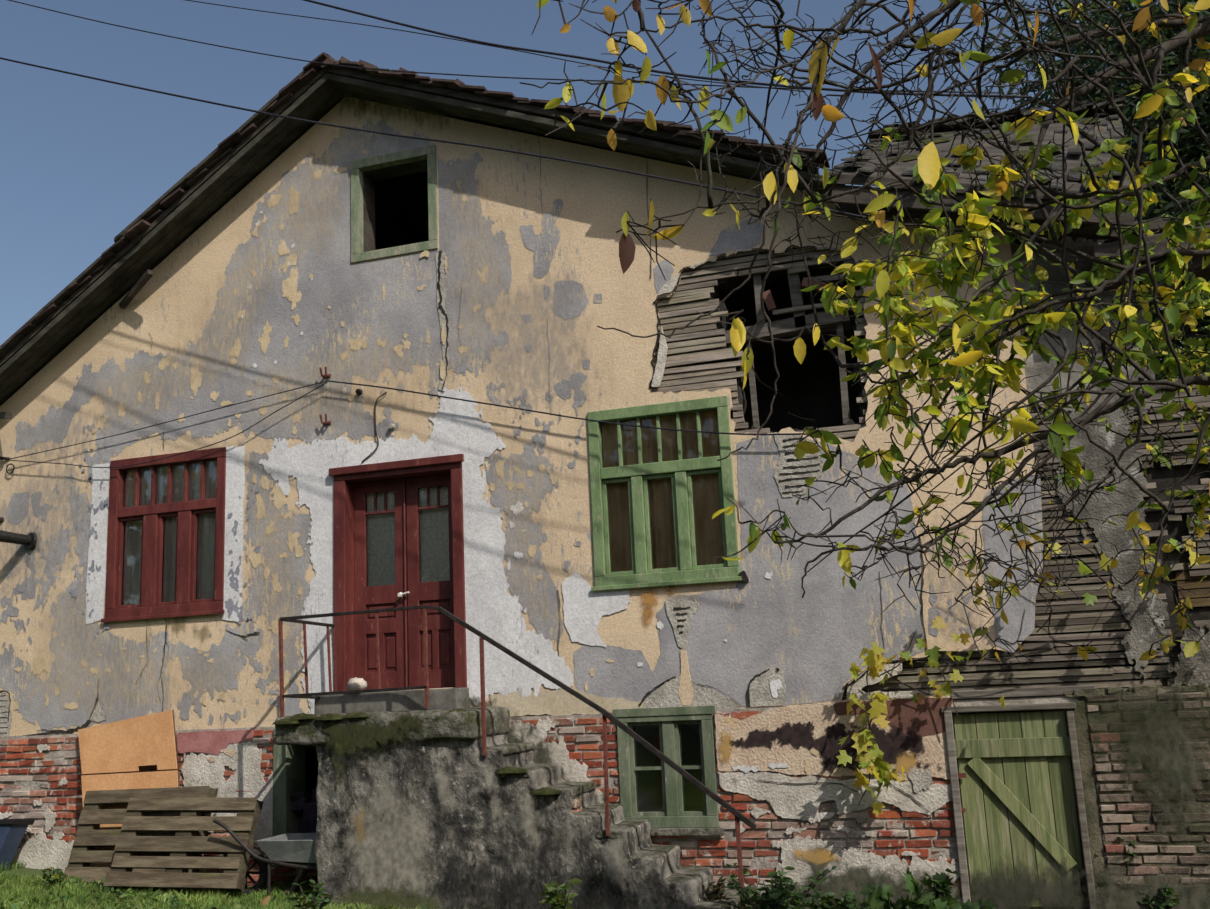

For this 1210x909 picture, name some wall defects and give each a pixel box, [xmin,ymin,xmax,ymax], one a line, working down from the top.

crack [420,250,462,392]
peeling [653,260,674,293]
peeling [709,217,764,256]
peeling [0,119,602,888]
peeling [982,474,1043,653]
flaking render [1010,236,1210,884]
peeling [574,432,963,906]
leakage [327,727,645,909]
leakage [507,717,565,780]
flaking render [509,717,620,804]
leakage [1118,686,1210,831]